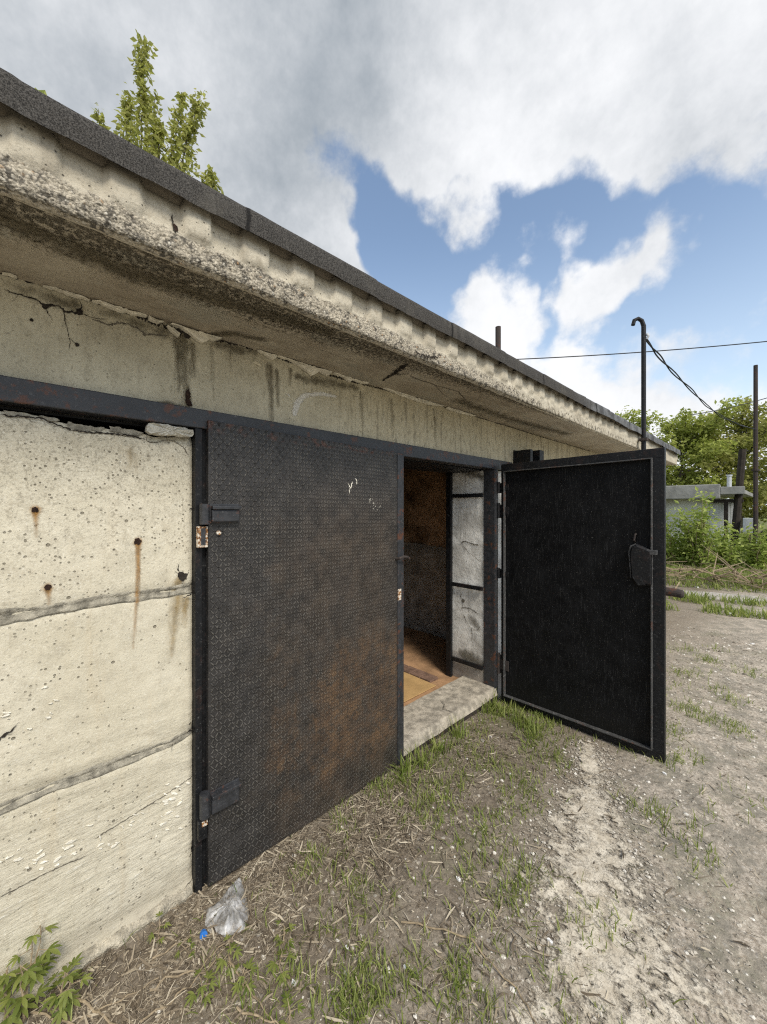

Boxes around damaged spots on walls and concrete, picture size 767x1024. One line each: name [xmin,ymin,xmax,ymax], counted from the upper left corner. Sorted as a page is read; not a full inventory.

crack [0,273,191,347]
water stain [0,168,568,434]
spalling [0,152,640,450]
crack [330,350,589,451]
corrosion [134,538,142,593]